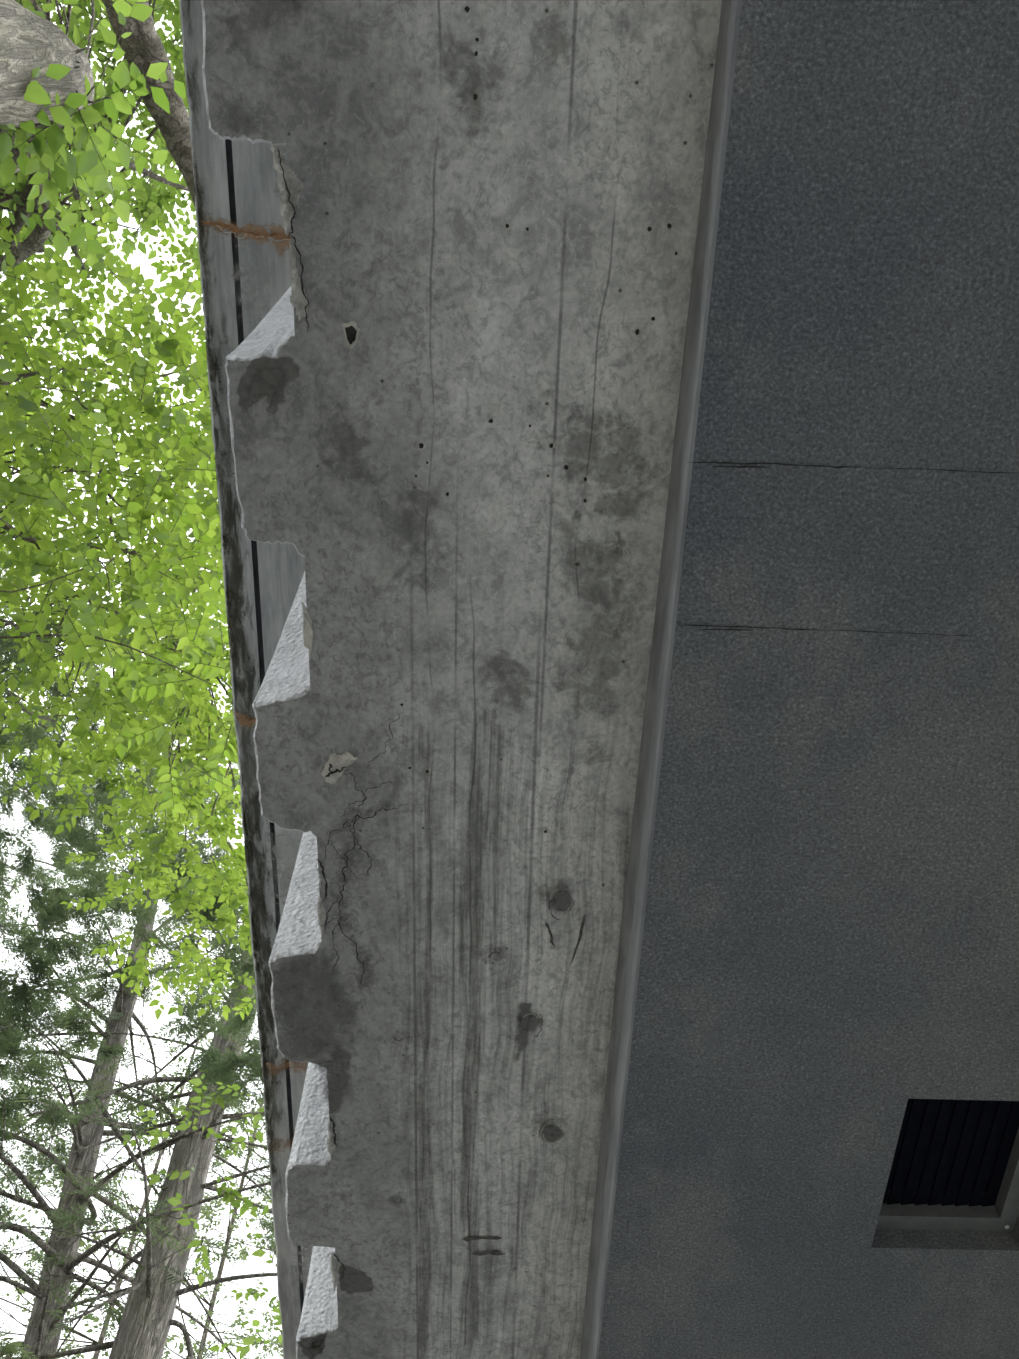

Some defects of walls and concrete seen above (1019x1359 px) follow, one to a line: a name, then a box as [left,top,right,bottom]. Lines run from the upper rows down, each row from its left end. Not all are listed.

spalling [302,601,314,658]
crack [325,712,412,992]
spalling [316,859,328,938]
water stain [462,1236,506,1256]